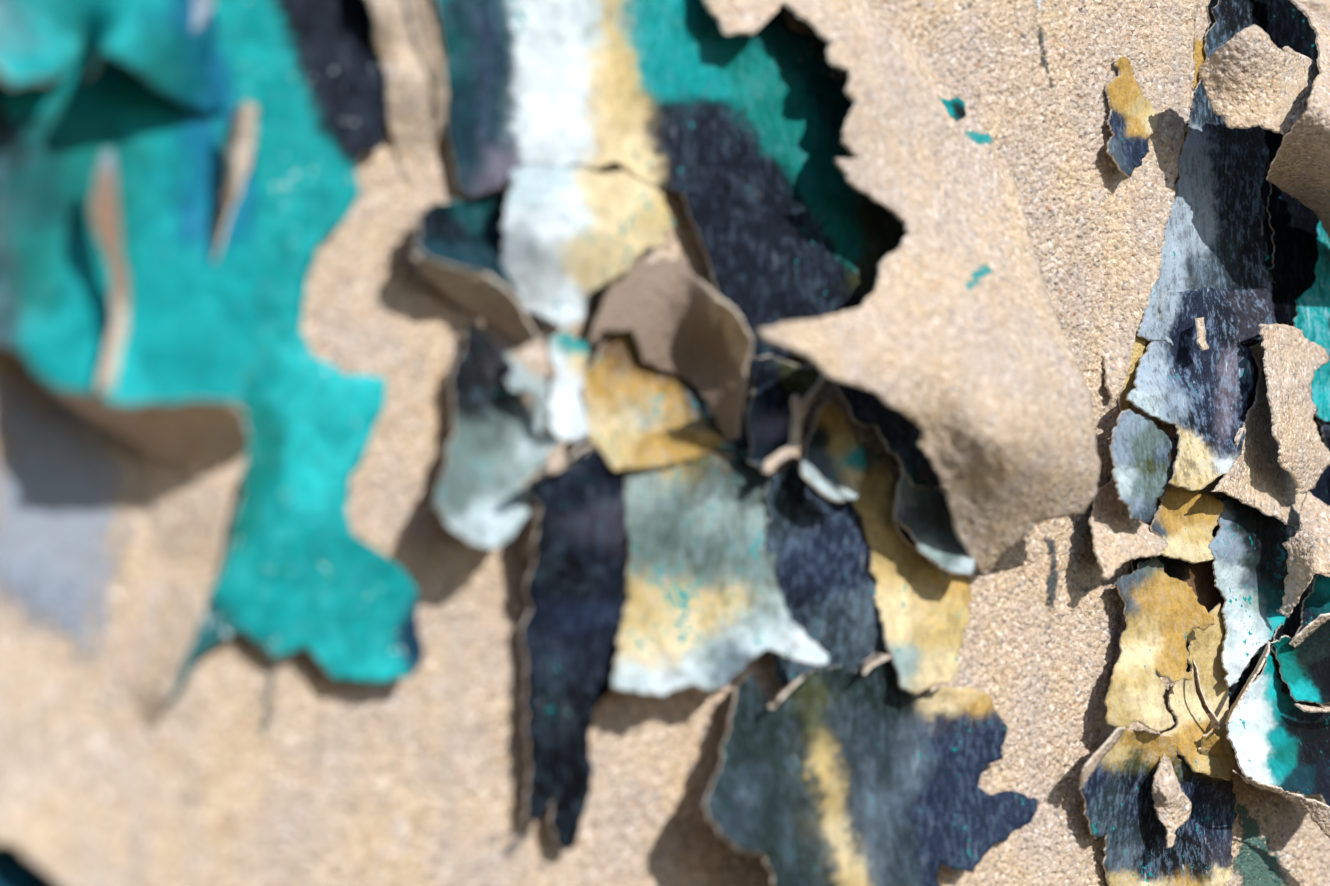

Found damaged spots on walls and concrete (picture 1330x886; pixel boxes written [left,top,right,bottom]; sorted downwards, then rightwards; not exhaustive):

peeling [0,632,211,886]
peeling [0,0,449,732]
peeling [413,0,1330,886]